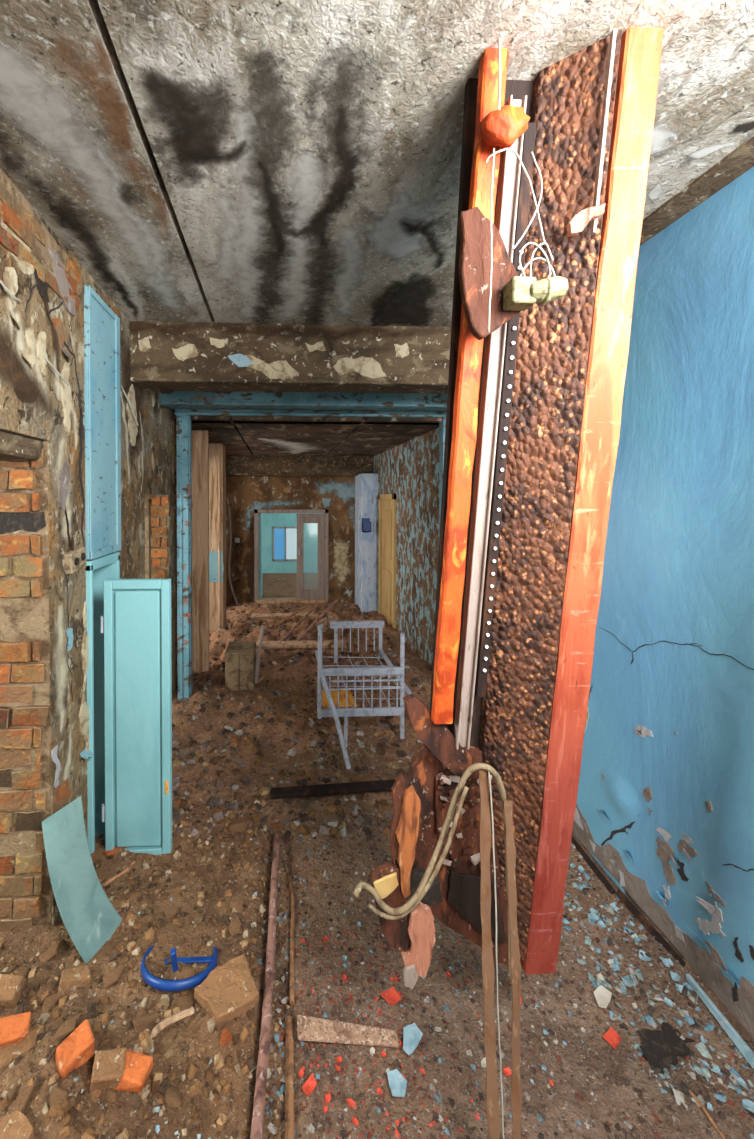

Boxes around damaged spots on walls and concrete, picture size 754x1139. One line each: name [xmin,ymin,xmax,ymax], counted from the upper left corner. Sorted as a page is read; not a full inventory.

leakage [0,47,180,308]
leakage [30,47,445,358]
leakage [0,286,49,408]
leakage [43,287,61,379]
peeling [172,344,198,361]
peeling [209,337,297,381]
peeling [333,356,387,378]
peeling [394,343,409,358]
leakage [120,346,144,485]
crack [598,627,754,670]
crack [601,815,639,846]
peeling [572,803,754,1040]